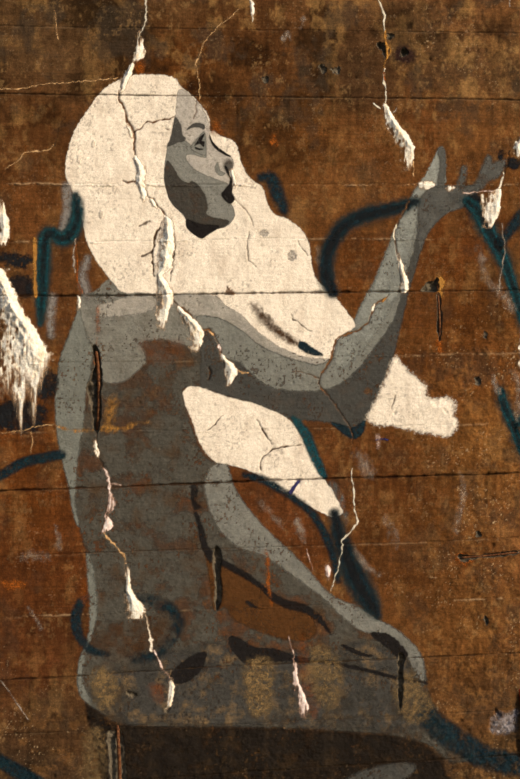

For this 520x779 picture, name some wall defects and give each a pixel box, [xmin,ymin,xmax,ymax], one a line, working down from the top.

crack [133,0,147,62]
crack [195,0,255,112]
crack [379,1,391,103]
crack [82,77,173,153]
crack [298,297,387,406]
crack [93,436,126,560]
crack [332,470,359,587]
crack [289,638,309,715]